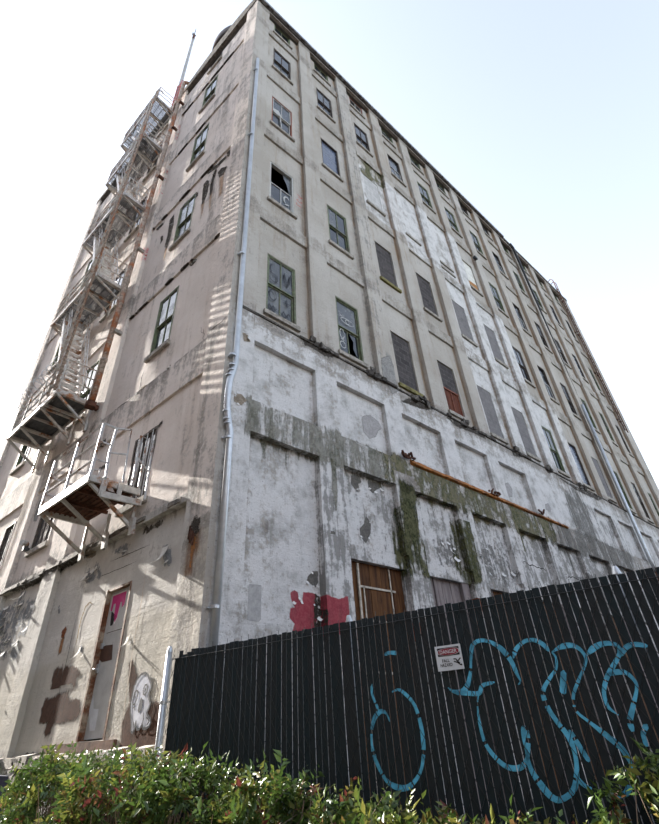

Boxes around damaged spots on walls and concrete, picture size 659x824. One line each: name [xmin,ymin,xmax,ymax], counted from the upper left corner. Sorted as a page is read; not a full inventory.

water stain [330,453,338,511]
rust [185,515,201,575]
peeling [0,590,36,660]